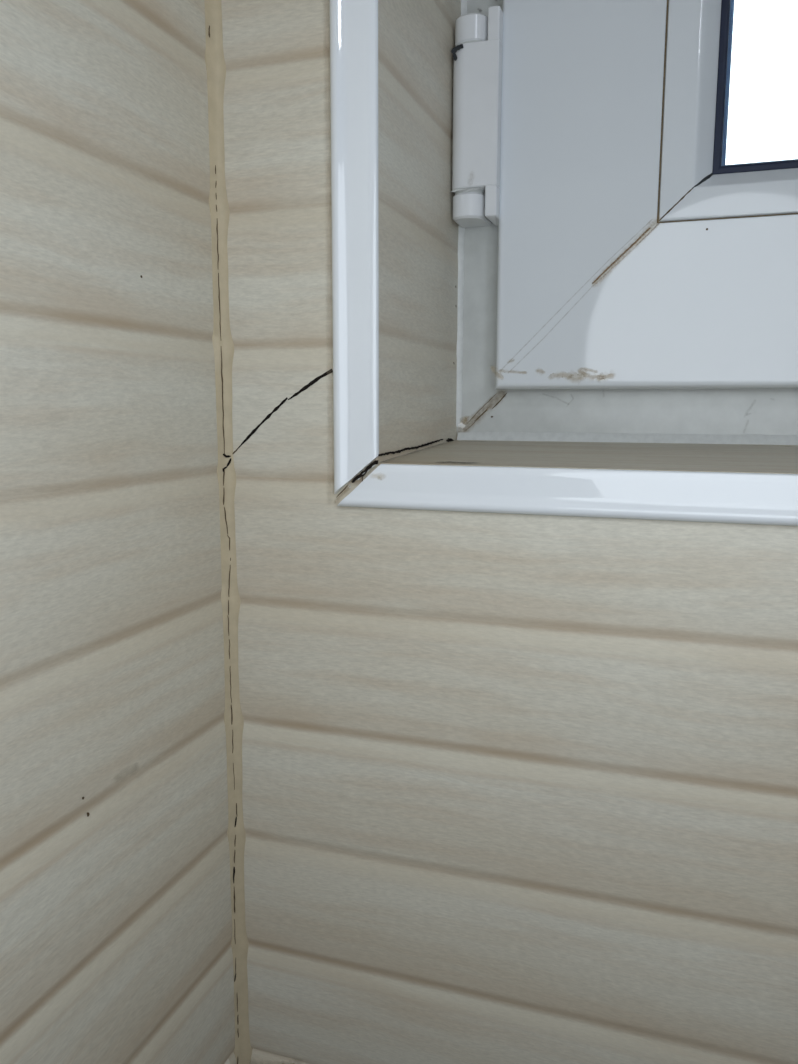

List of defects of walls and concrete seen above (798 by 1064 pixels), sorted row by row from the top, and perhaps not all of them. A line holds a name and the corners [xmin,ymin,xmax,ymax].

crack [378,438,454,461]